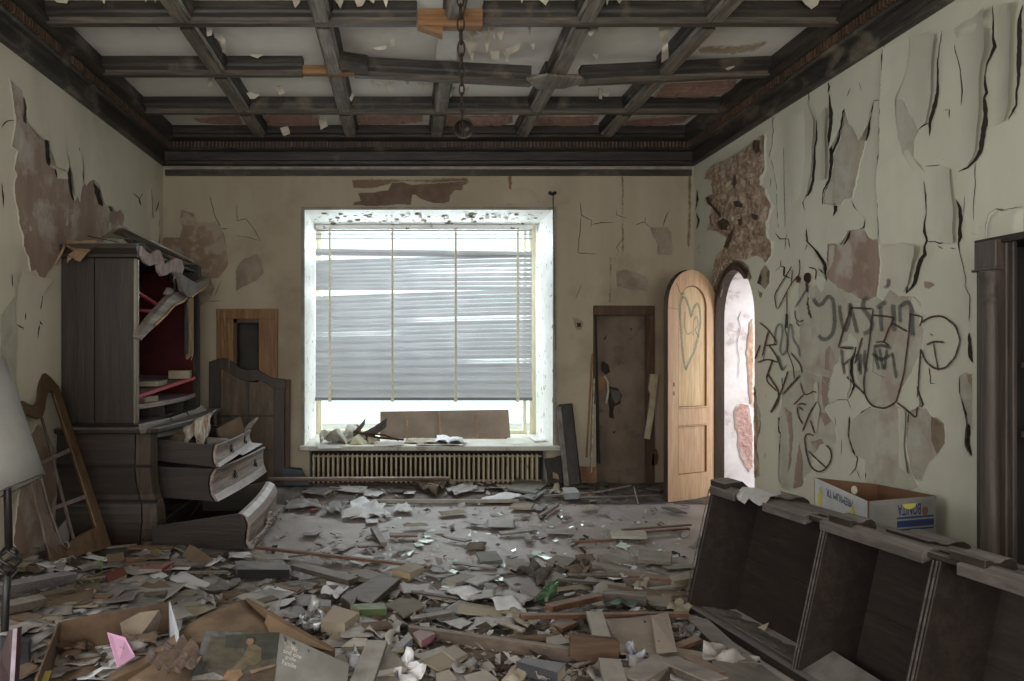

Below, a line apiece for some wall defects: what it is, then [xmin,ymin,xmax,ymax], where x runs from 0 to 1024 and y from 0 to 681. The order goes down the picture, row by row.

flaking render [0,79,125,399]
flaking render [163,209,265,308]
flaking render [317,181,537,225]
crack [578,202,668,254]
flaking render [704,129,774,299]
flaking render [778,87,947,492]
crack [769,2,1023,478]
flaking render [734,319,763,479]